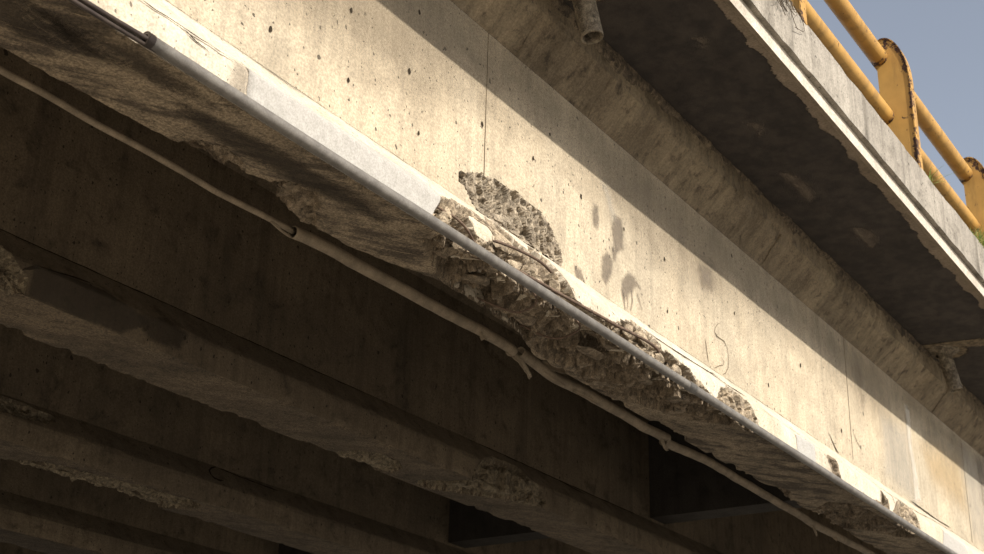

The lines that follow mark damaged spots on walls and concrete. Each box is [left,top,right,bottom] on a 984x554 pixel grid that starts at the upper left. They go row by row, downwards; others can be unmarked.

crack [143,0,404,161]
spalling [262,178,323,231]
leakage [596,0,984,404]
spalling [416,171,759,433]
spalling [827,455,843,480]
spalling [812,490,921,538]